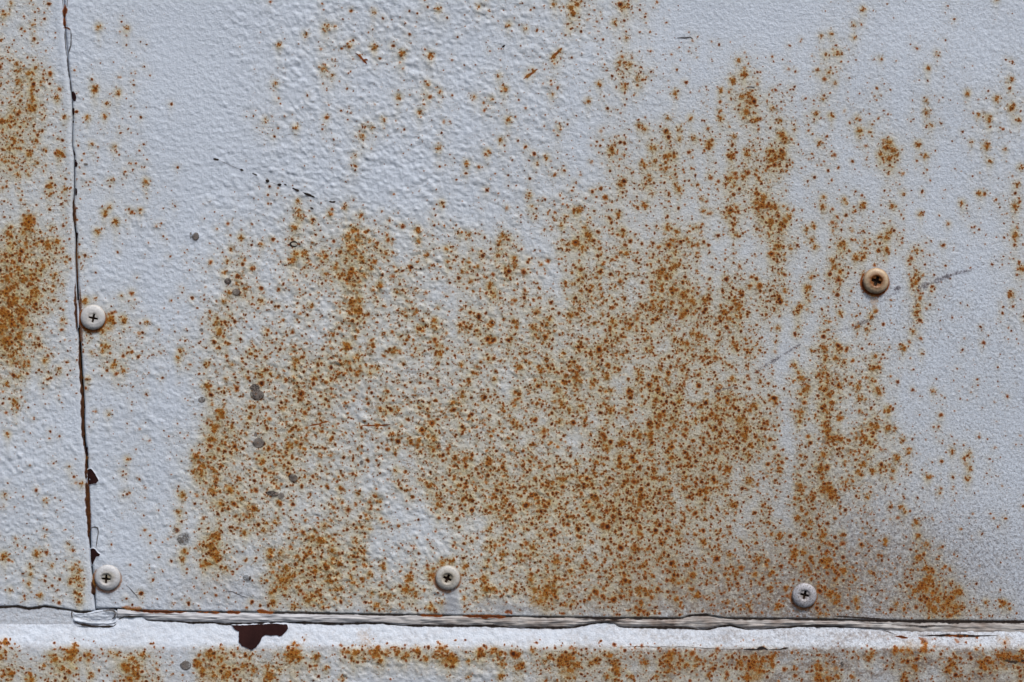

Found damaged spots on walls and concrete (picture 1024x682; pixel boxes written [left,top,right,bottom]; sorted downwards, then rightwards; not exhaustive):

corrosion [907,59,1022,163]
corrosion [960,164,1024,344]
corrosion [919,378,975,513]
peeling [231,622,289,651]
corrosion [0,635,1024,682]